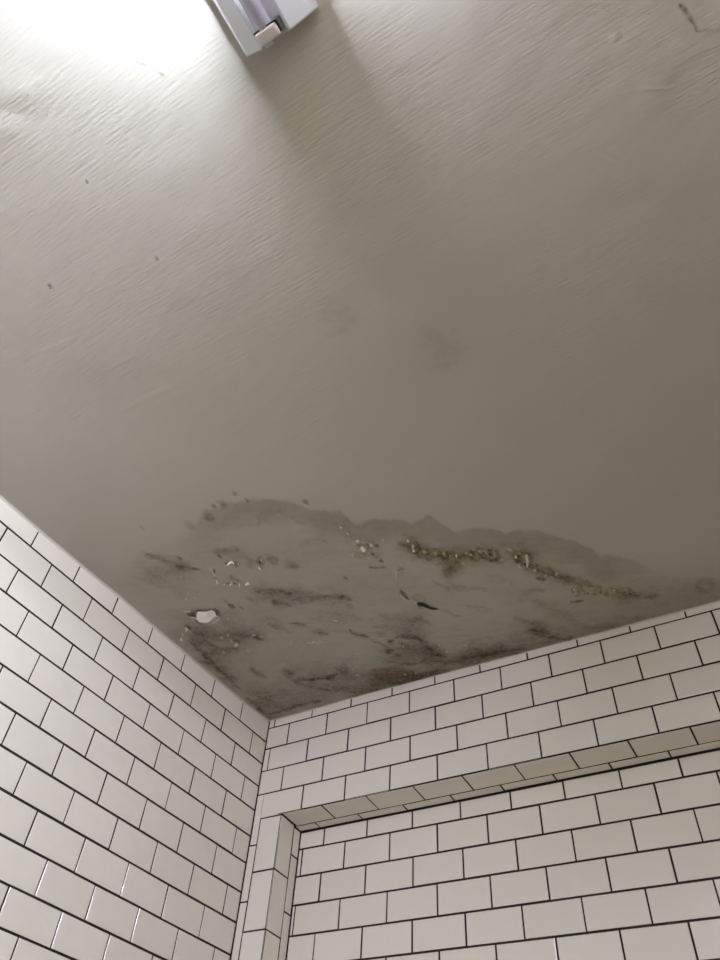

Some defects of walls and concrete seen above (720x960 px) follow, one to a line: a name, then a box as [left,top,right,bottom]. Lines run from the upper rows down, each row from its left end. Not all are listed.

peeling [403,540,564,580]
peeling [180,610,237,641]